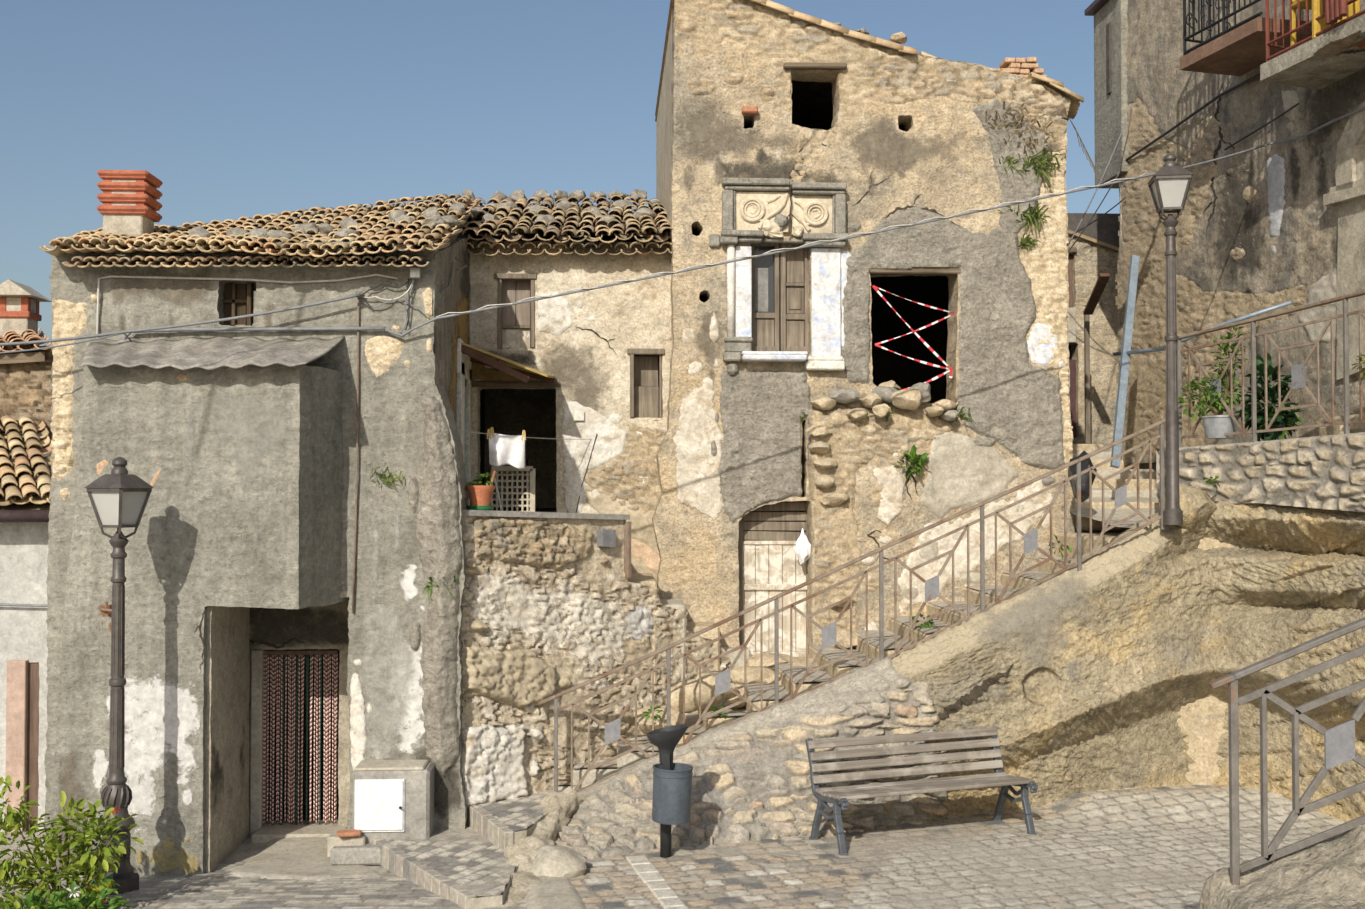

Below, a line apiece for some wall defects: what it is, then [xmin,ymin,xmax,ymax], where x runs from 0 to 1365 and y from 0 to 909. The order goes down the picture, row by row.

flaking render [676,0,1073,464]
crack [1204,87,1234,227]
flaking render [365,325,410,377]
crack [577,327,619,358]
peeling [399,564,425,611]
peeling [465,312,724,707]
flaking render [808,380,1056,647]
peeling [93,674,200,832]